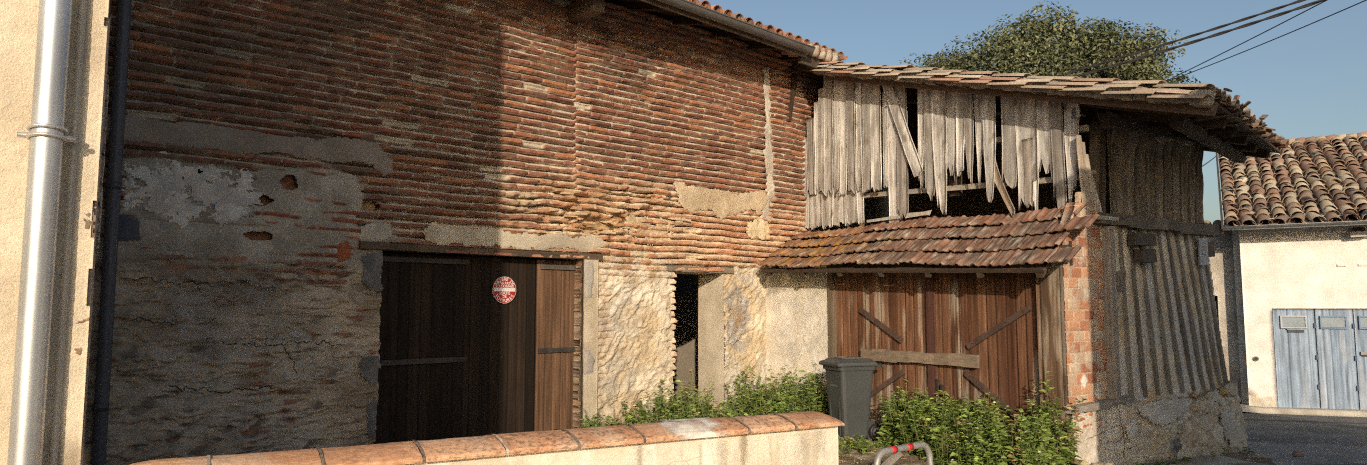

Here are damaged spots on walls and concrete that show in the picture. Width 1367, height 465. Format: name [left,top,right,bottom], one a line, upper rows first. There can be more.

peeling [122,151,272,240]
spalling [280,176,296,190]